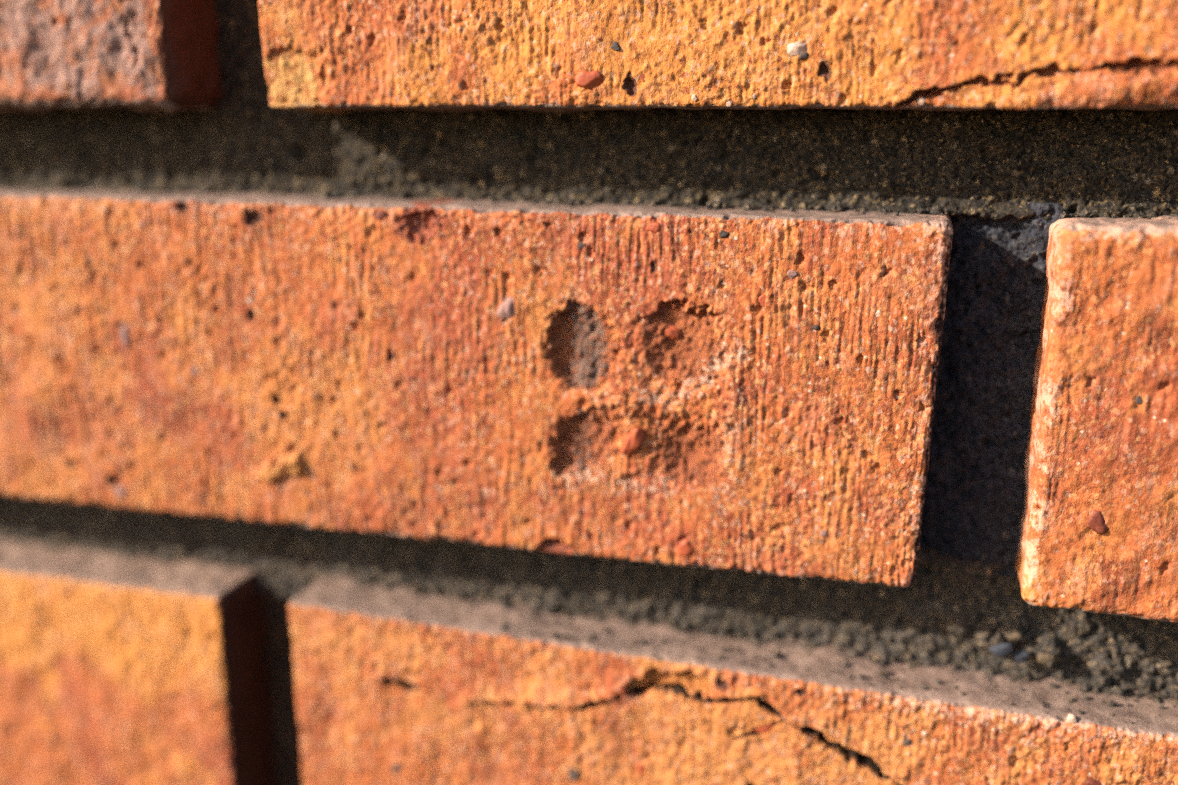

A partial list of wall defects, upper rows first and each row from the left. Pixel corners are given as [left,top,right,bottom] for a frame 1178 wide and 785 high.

crack [895,57,1178,110]
spalling [544,300,617,389]
spalling [645,300,728,383]
spalling [551,407,617,479]
spalling [652,421,725,489]
crack [470,667,901,785]